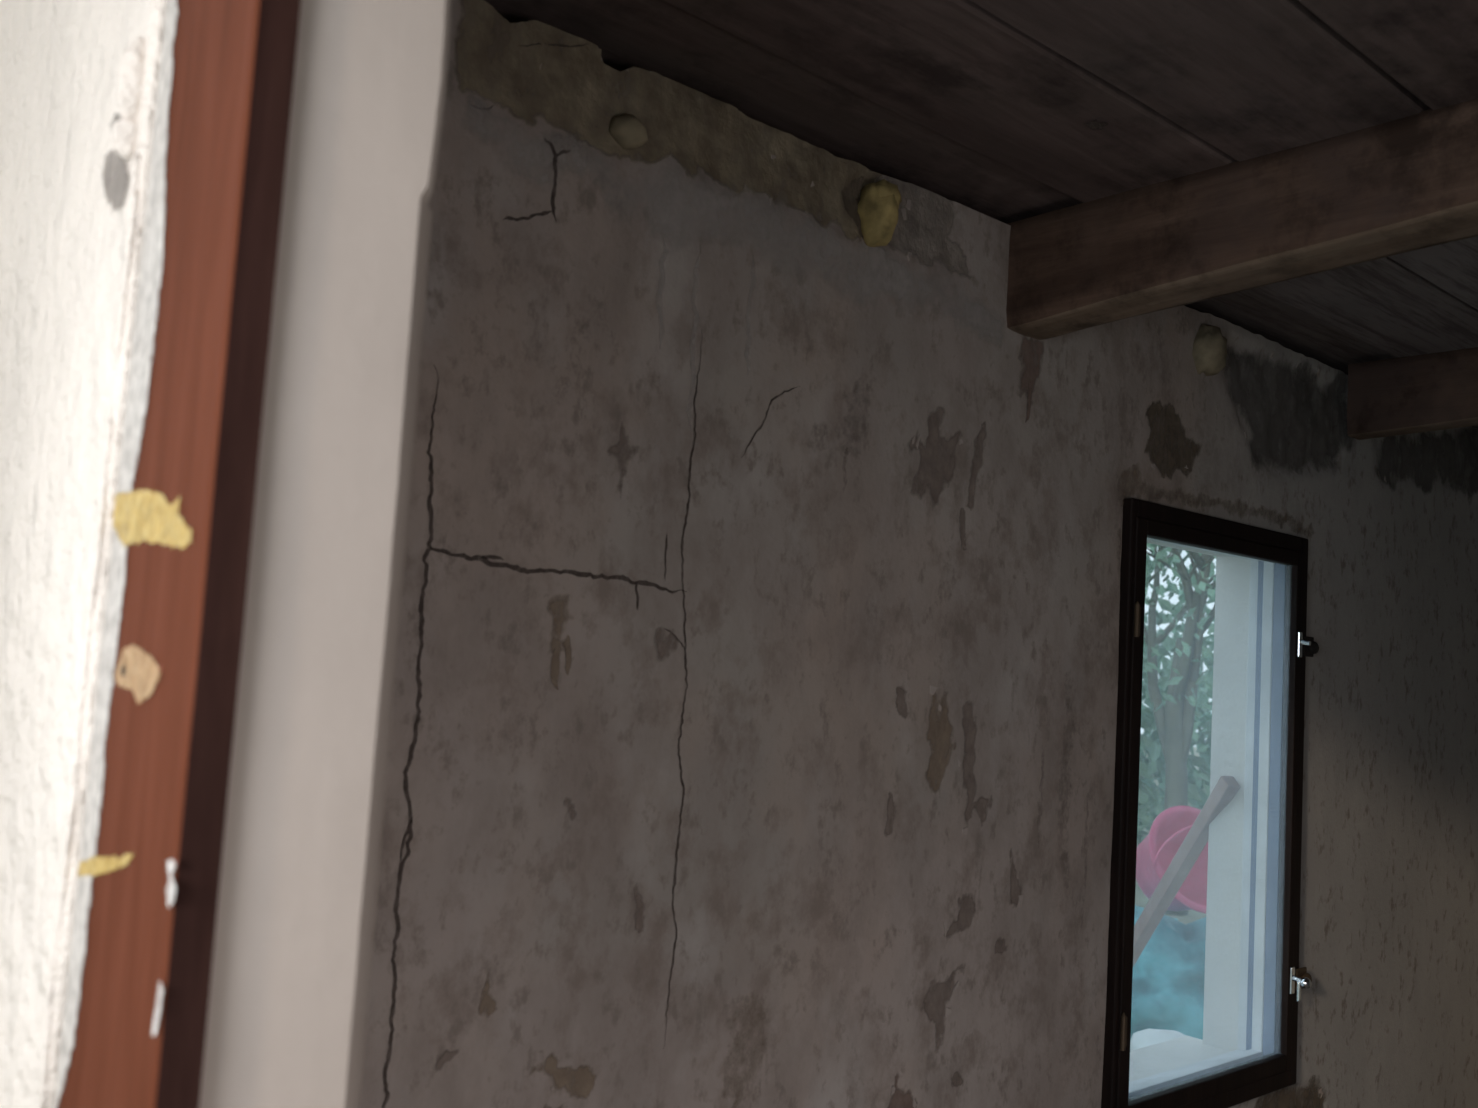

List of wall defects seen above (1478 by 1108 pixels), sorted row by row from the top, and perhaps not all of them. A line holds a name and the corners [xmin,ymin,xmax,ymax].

crack [503,138,571,222]
spalling [456,0,969,277]
peeling [114,644,162,704]
crack [382,330,703,1108]